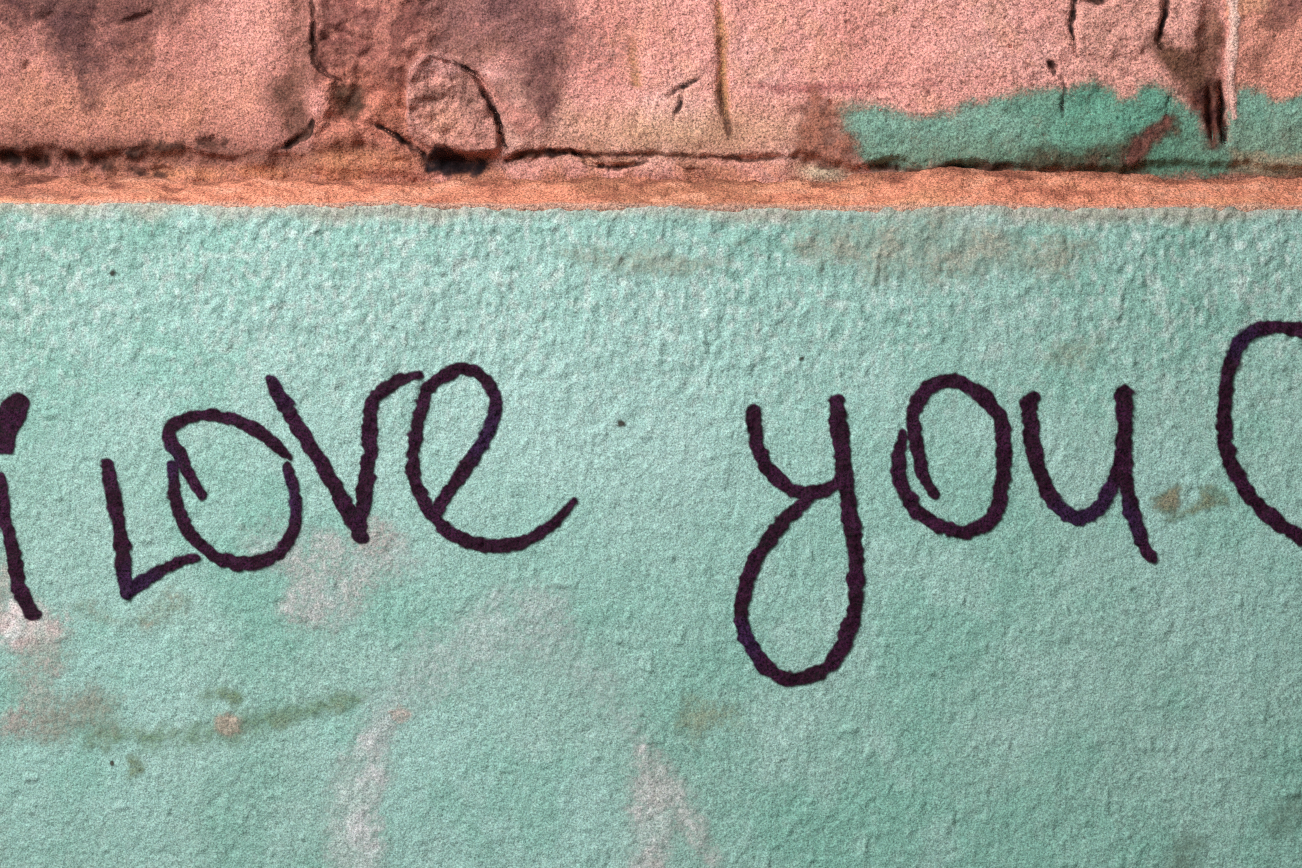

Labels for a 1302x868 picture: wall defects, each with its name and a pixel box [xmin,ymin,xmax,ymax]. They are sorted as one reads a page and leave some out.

leakage [31,0,103,108]
leakage [112,0,150,75]
crack [283,119,315,149]
crack [308,0,335,78]
leakage [334,85,365,120]
crack [376,125,427,157]
leakage [417,50,561,128]
crack [431,57,765,170]
crack [1047,0,1077,111]
crack [1157,0,1170,50]
crack [1219,91,1227,144]
peeling [1231,150,1302,176]